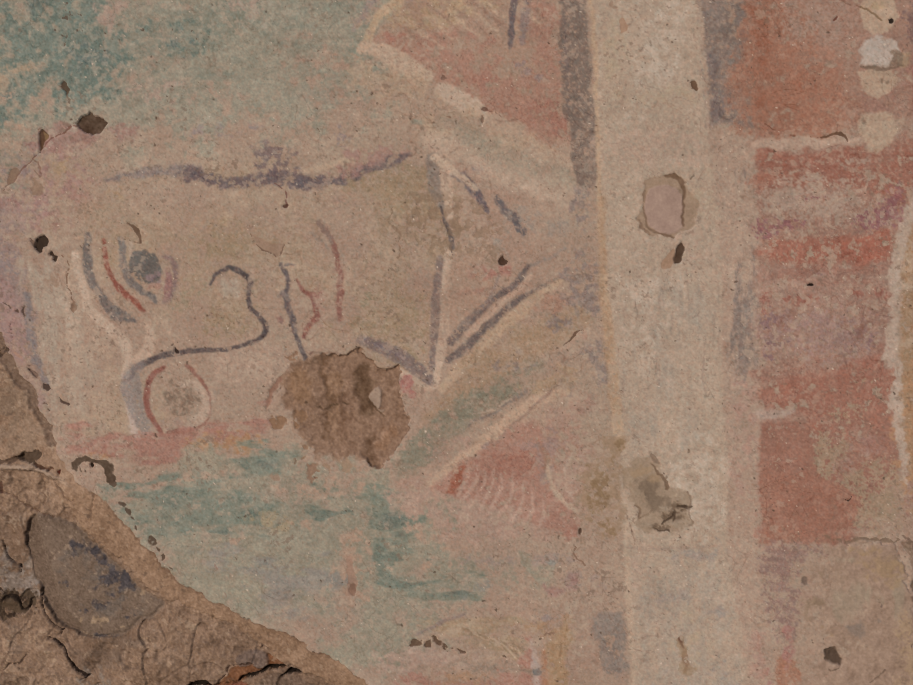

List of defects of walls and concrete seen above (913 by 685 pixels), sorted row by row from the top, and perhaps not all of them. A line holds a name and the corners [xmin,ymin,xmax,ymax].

spalling [75,112,108,135]
spalling [30,235,49,253]
peeling [661,243,685,270]
spalling [266,346,411,483]
crack [0,449,95,522]
spalling [0,324,368,685]
peeling [620,453,695,545]
crack [41,592,92,678]
crack [189,662,302,685]